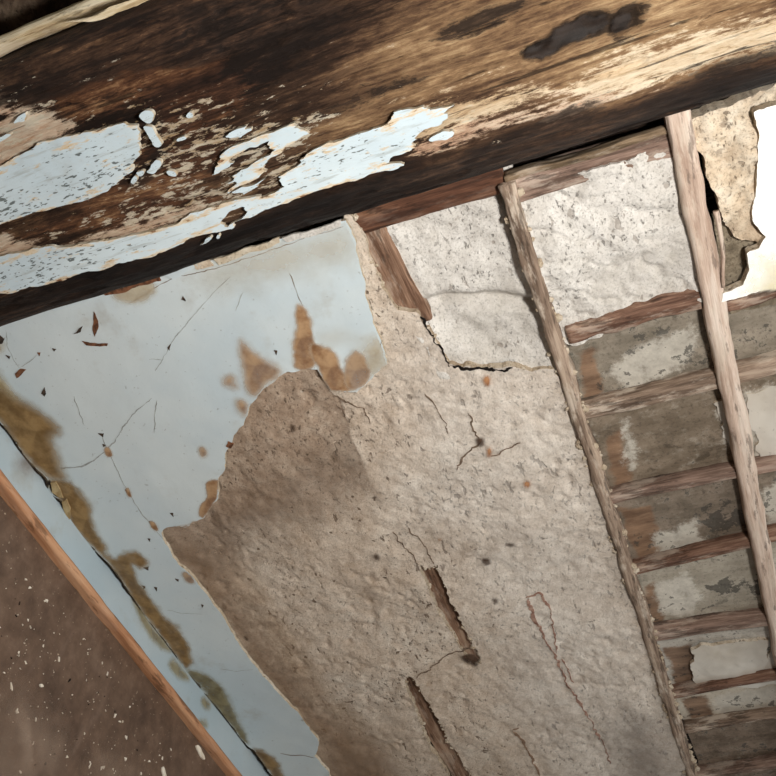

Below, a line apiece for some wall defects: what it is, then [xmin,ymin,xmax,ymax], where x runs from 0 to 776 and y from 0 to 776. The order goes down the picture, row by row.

peeling [0,103,455,294]
peeling [51,299,89,311]
leakage [240,344,279,395]
leakage [293,305,383,391]
crack [420,316,513,372]
spalling [104,213,686,776]
leakage [0,378,247,743]
crack [393,528,434,564]
crack [417,647,470,678]
peeling [690,637,769,684]
leakage [255,749,283,776]